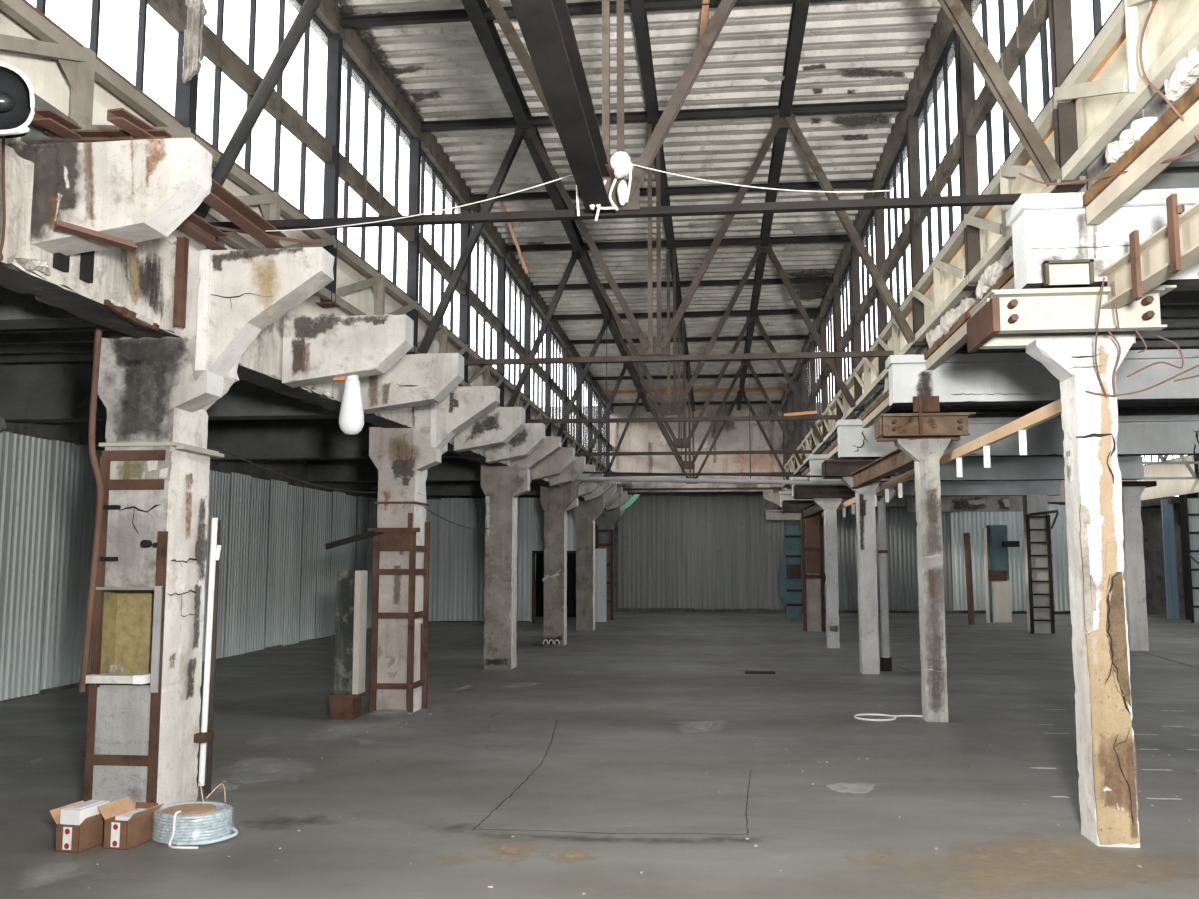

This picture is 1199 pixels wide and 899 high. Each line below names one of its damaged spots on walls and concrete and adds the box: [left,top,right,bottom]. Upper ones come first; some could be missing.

leakage [114,338,184,440]
leakage [292,314,388,373]
crack [119,504,161,534]
peeling [1080,504,1140,845]